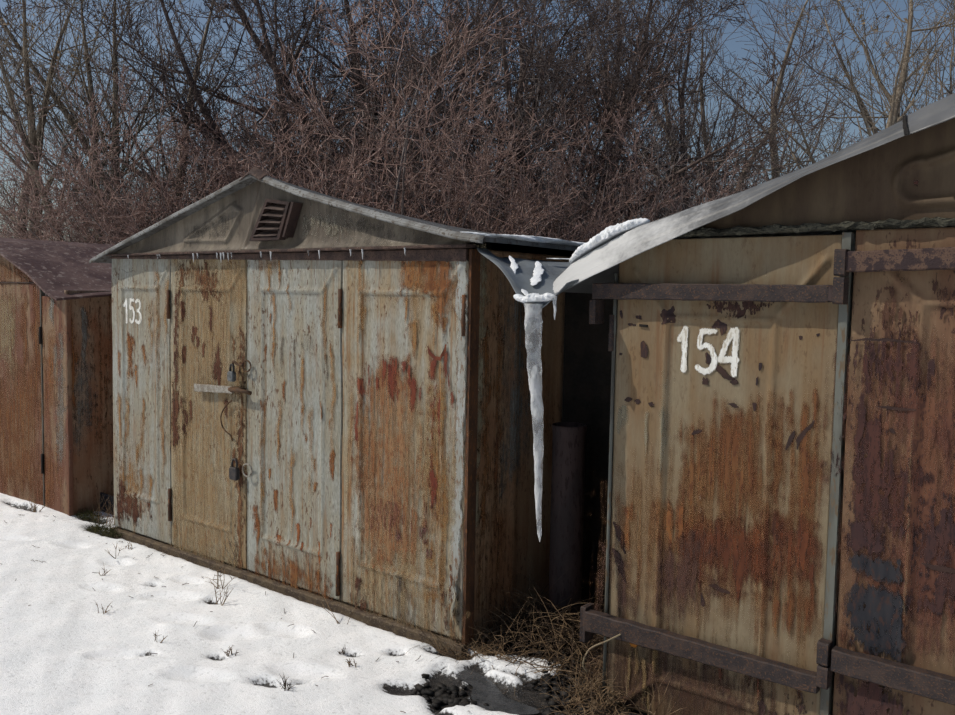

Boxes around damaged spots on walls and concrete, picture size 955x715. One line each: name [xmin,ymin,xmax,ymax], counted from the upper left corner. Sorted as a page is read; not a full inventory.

corrosion [71,273,222,526]
corrosion [257,260,291,365]
corrosion [224,283,336,599]
corrosion [350,261,462,641]
corrosion [627,649,658,709]
corrosion [834,674,910,715]